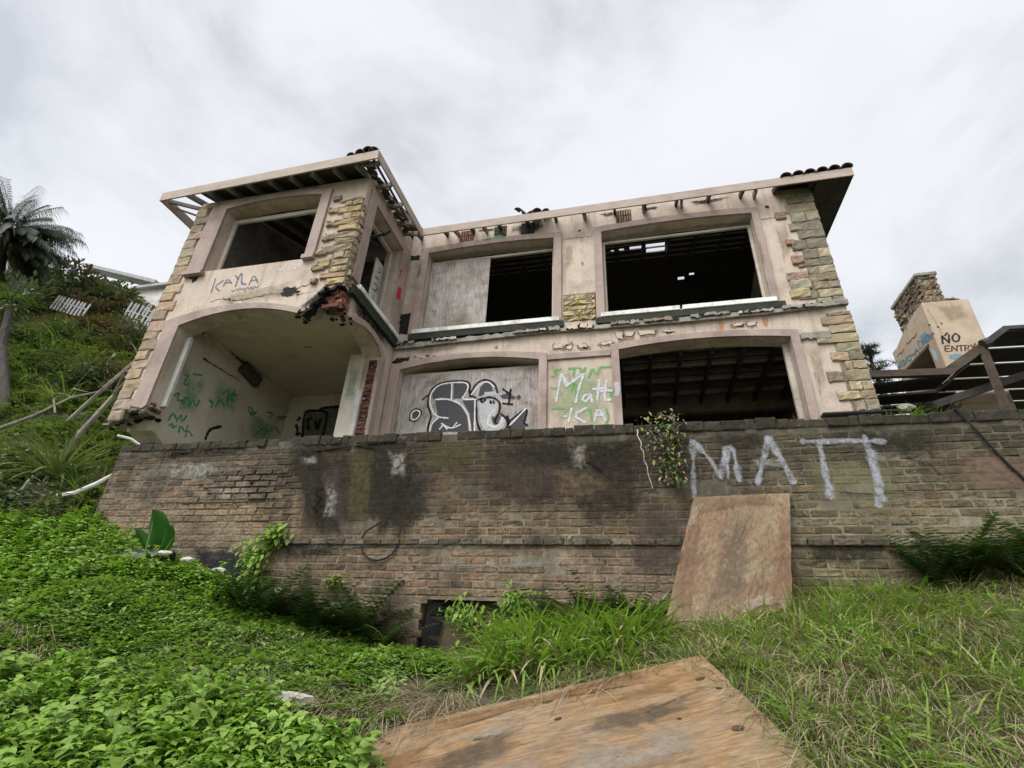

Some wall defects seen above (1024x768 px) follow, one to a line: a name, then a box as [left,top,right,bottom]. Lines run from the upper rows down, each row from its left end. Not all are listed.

crack [211,284,315,302]
spalling [295,283,353,326]
spalling [512,292,825,351]